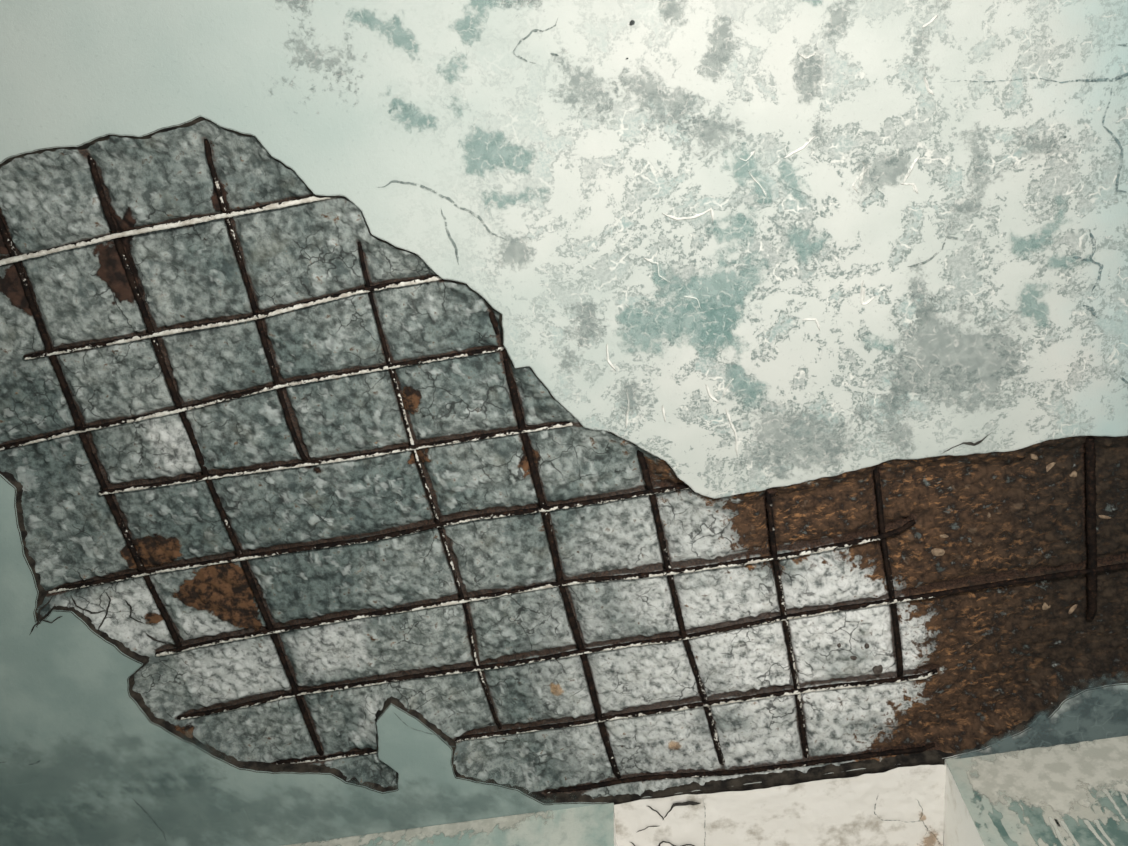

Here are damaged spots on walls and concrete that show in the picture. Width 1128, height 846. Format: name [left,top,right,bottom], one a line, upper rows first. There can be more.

crack [940,43,1128,193]
corrosion [0,215,36,316]
corrosion [93,198,146,305]
crack [383,180,507,265]
crack [1074,233,1103,319]
spalling [0,116,1097,650]
corrosion [120,533,183,570]
corrosion [145,612,164,626]
corrosion [172,562,262,632]
spalling [0,346,1128,805]
leakage [959,677,1128,846]
crack [631,801,706,846]